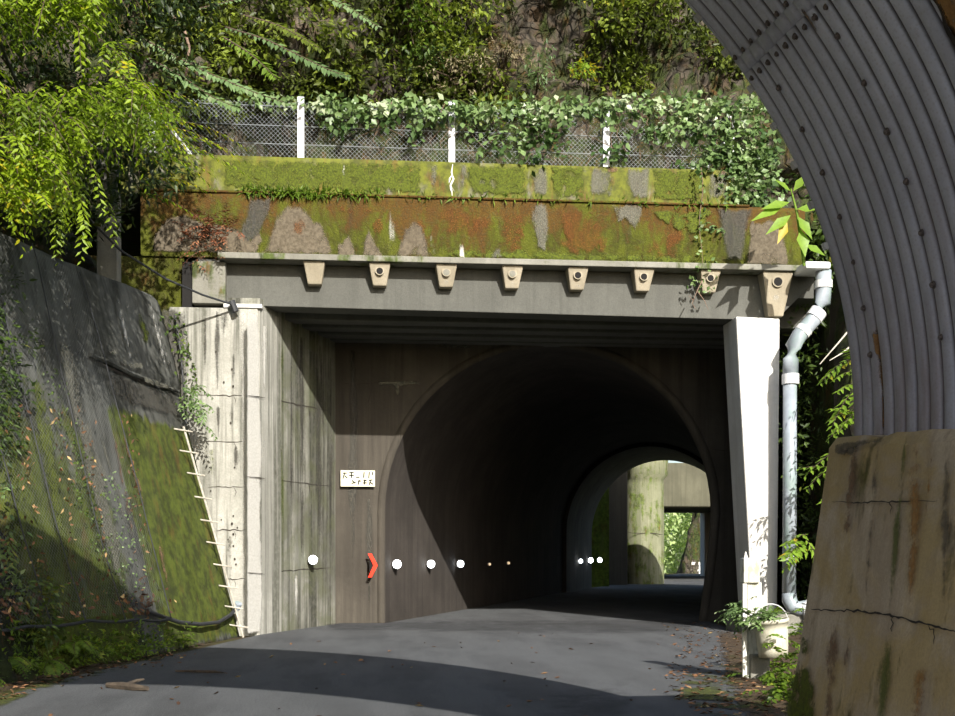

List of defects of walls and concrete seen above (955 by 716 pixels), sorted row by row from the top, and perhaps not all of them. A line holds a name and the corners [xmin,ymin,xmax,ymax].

water stain [242,199,270,240]
water stain [533,204,548,249]
water stain [204,314,227,378]
water stain [281,335,332,547]
water stain [217,312,266,633]
crack [837,500,935,511]
crack [811,609,955,643]